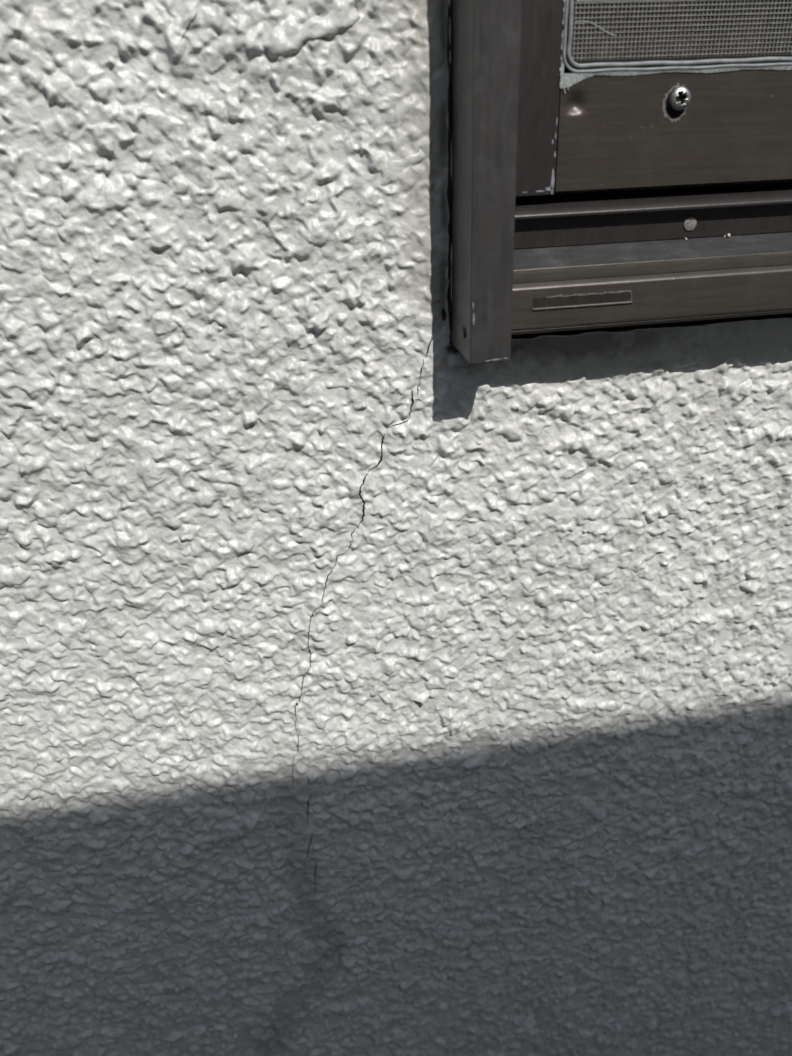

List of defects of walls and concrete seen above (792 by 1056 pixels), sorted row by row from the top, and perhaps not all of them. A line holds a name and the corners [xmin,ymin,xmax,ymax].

crack [292,0,452,892]